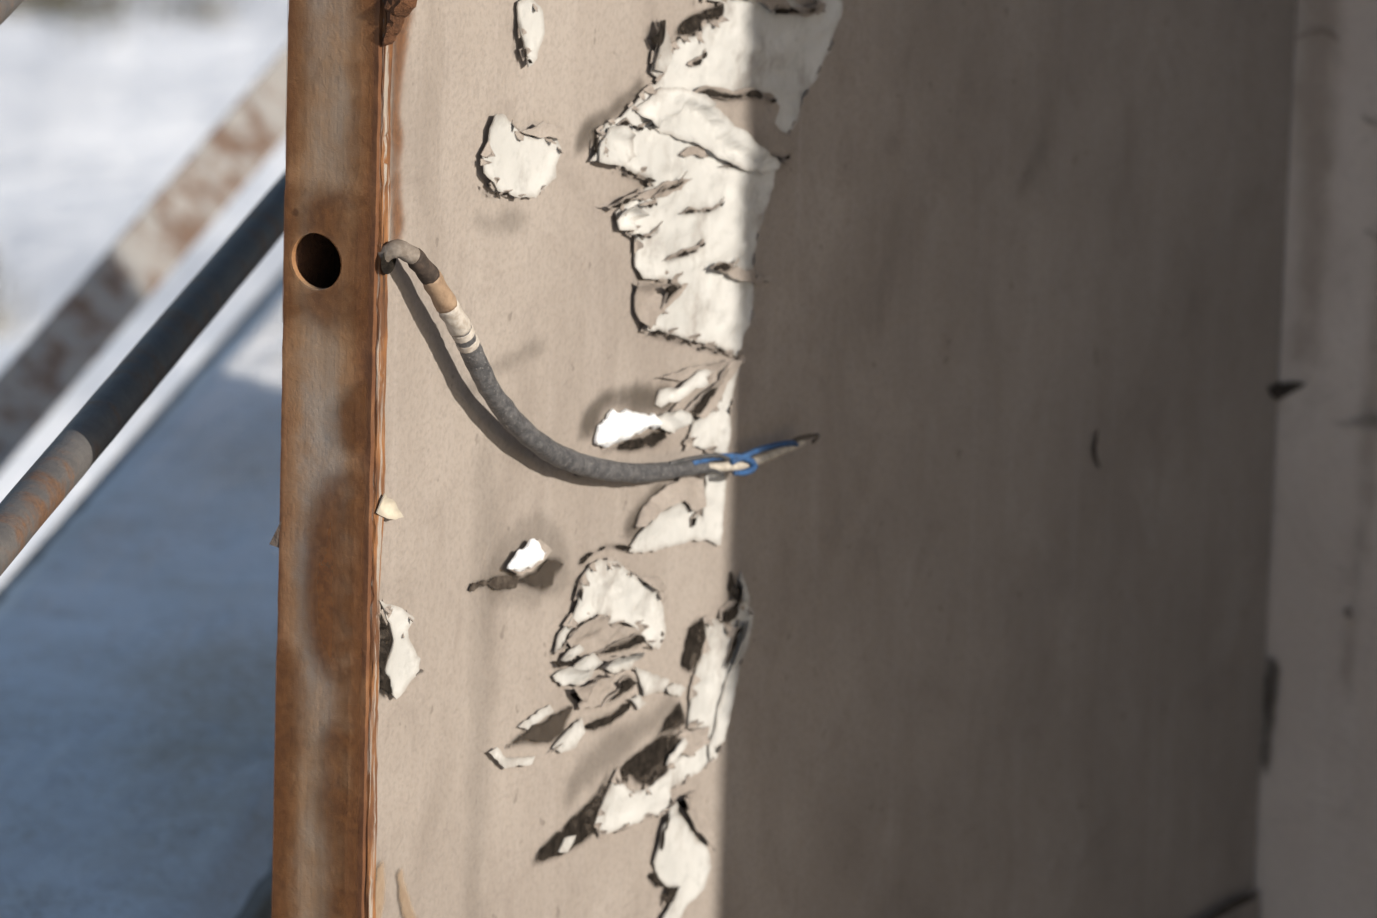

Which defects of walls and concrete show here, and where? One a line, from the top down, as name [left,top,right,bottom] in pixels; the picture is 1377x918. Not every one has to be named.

peeling [516,0,545,67]
peeling [480,113,566,200]
rust [282,190,370,329]
peeling [590,0,843,453]
rust [308,477,365,675]
peeling [469,539,564,592]
peeling [379,599,424,699]
peeling [488,472,754,918]
rust [271,647,301,918]